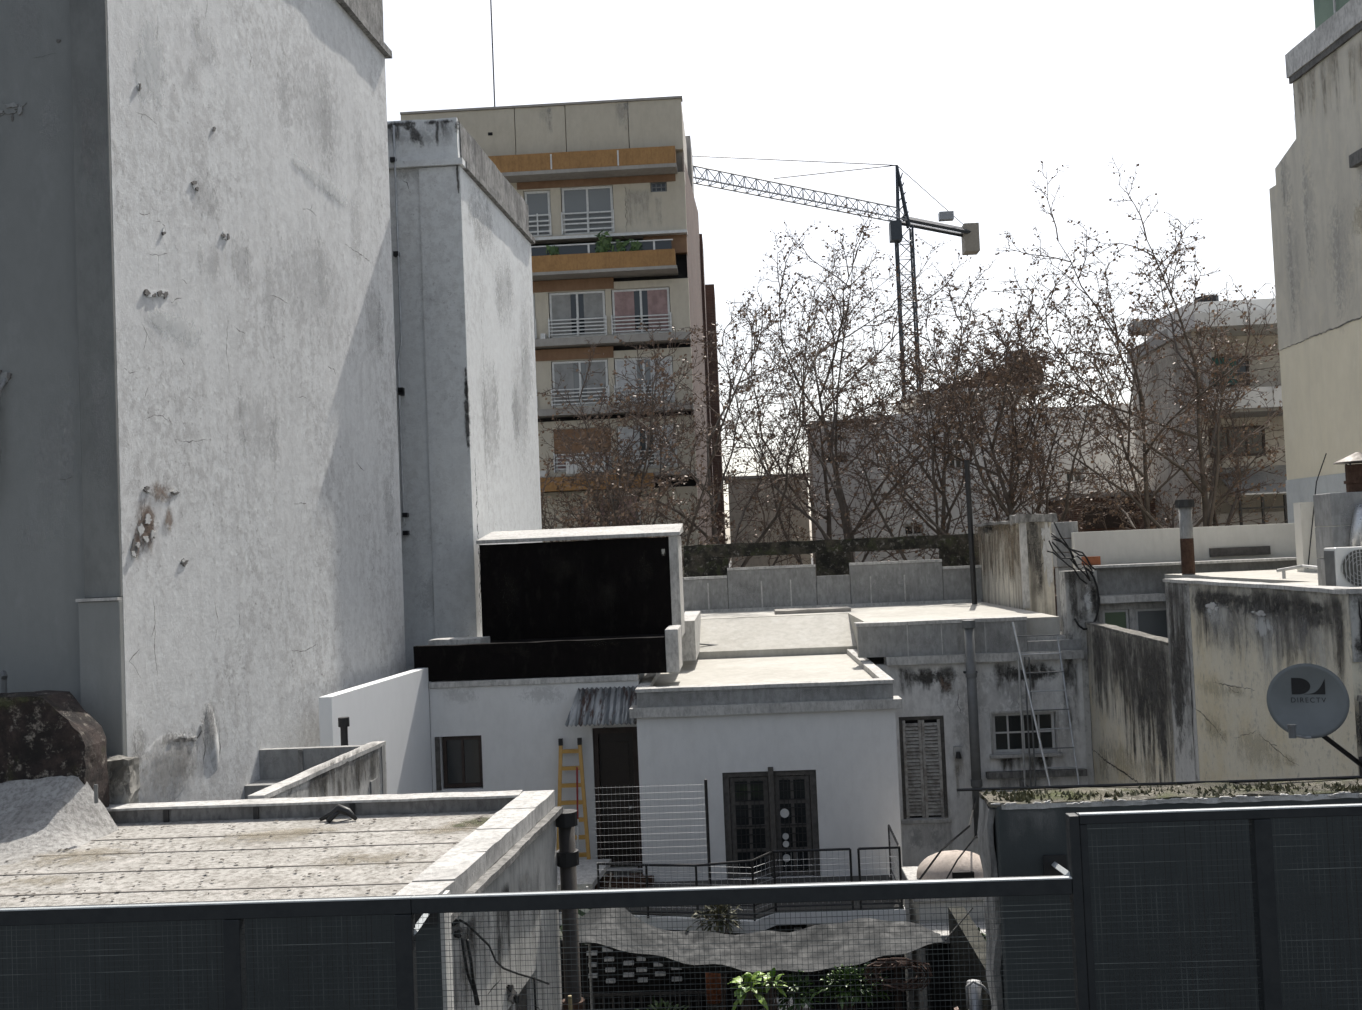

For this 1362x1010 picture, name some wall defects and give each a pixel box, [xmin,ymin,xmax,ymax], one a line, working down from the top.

peeling [130,514,156,558]
leakage [900,668,953,689]
leakage [998,659,1077,689]
leakage [1093,589,1361,782]
leakage [1002,757,1047,769]